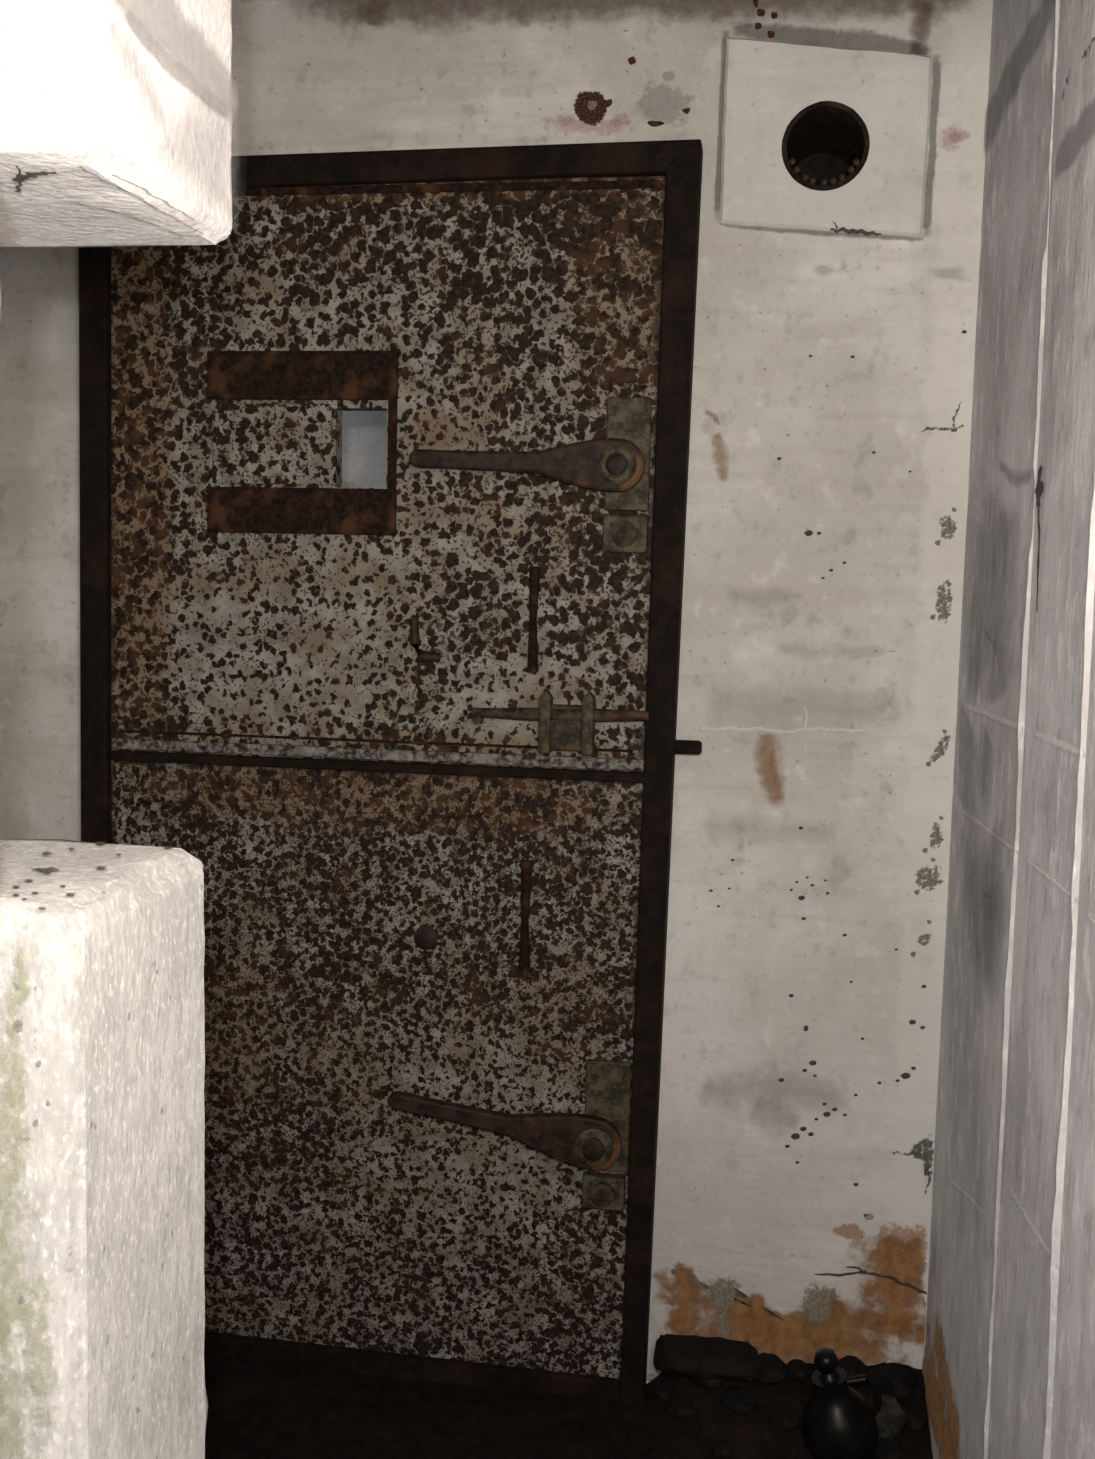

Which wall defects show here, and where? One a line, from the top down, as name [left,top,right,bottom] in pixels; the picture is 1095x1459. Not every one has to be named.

rust [763,736,779,799]
spalling [785,1103,847,1164]
peeling [834,1214,928,1294]
peeling [677,1264,739,1338]
peeling [802,1285,835,1326]
rust [654,1237,959,1459]